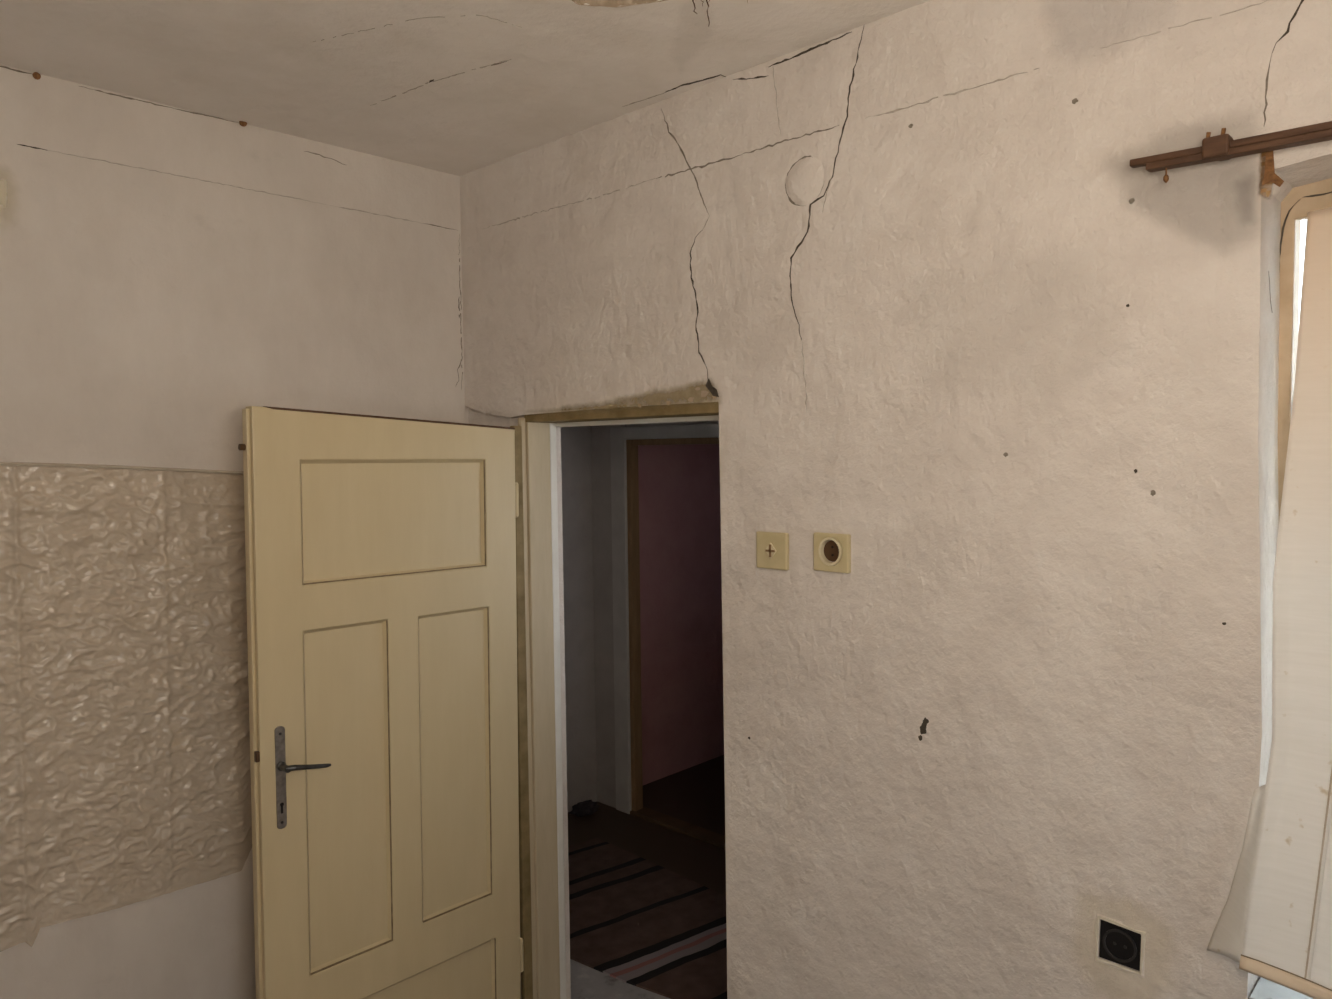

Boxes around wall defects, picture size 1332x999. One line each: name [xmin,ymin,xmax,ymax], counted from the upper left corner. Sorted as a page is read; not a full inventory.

crack [0,66,32,74]
crack [1103,0,1304,125]
crack [17,27,1038,410]